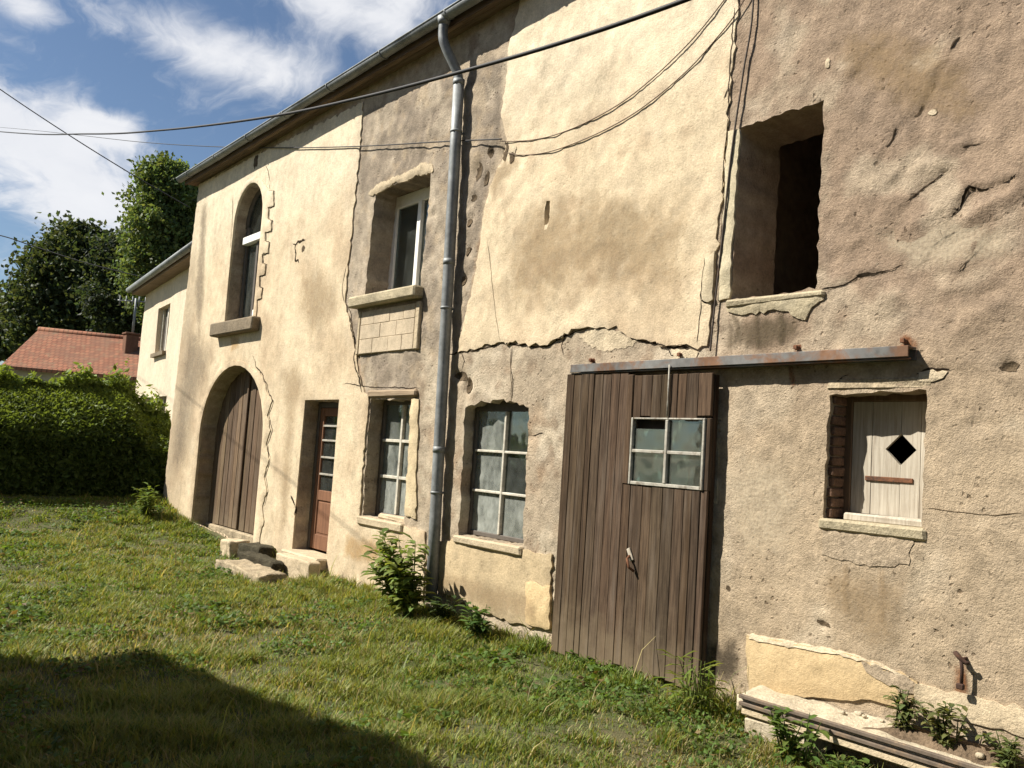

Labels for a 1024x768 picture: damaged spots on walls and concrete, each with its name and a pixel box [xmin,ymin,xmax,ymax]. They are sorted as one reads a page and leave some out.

spalling [471,142,517,202]
crack [638,8,735,356]
crack [930,174,1016,249]
crack [450,243,589,402]
spalling [727,292,824,320]
crack [822,264,903,289]
crack [253,357,297,515]
flaking render [745,633,1024,738]